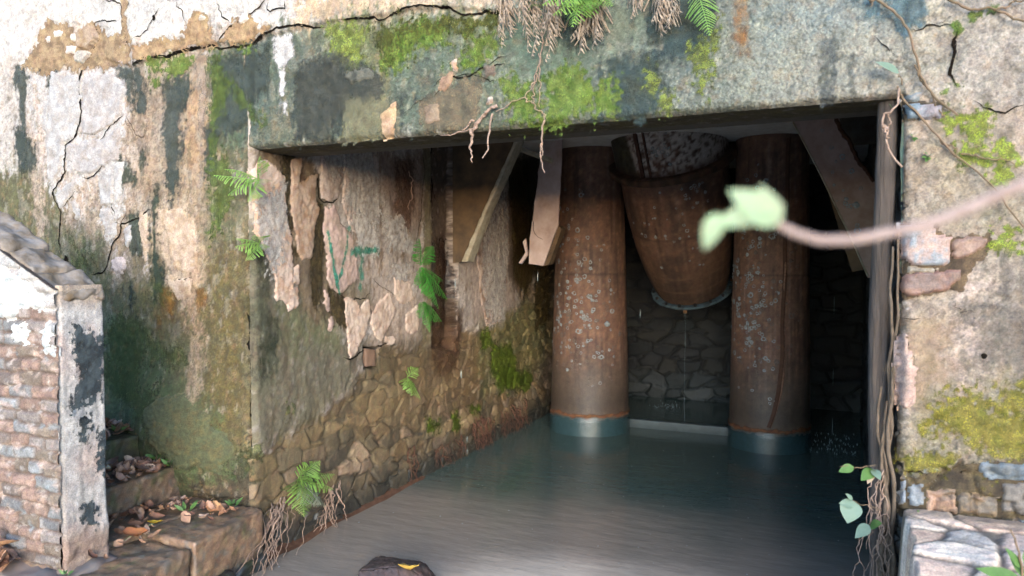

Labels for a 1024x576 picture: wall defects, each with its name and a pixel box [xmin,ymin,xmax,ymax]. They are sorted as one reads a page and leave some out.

crack [914,17,957,86]
flaking render [0,265,61,357]
water stain [12,64,57,174]
crack [92,203,149,275]
flaking render [21,0,271,301]
water stain [116,33,330,301]
crack [52,0,517,253]
flaking render [247,51,420,358]
water stain [396,92,416,140]
flaking render [896,221,992,300]
water stain [64,322,111,478]
water stain [78,500,100,532]